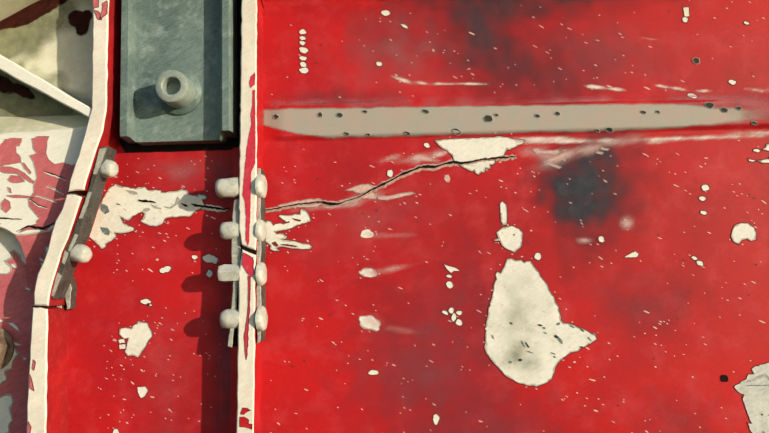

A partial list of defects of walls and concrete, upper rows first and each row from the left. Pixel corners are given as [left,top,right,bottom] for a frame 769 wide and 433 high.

peeling [0,228,26,275]
peeling [0,138,35,184]
crack [138,197,156,205]
peeling [89,183,208,250]
crack [180,203,230,212]
crack [265,154,517,213]
peeling [423,128,569,176]
peeling [730,222,757,245]
peeling [483,200,598,390]
peeling [117,320,153,360]
peeling [0,394,14,433]
peeling [720,362,769,433]